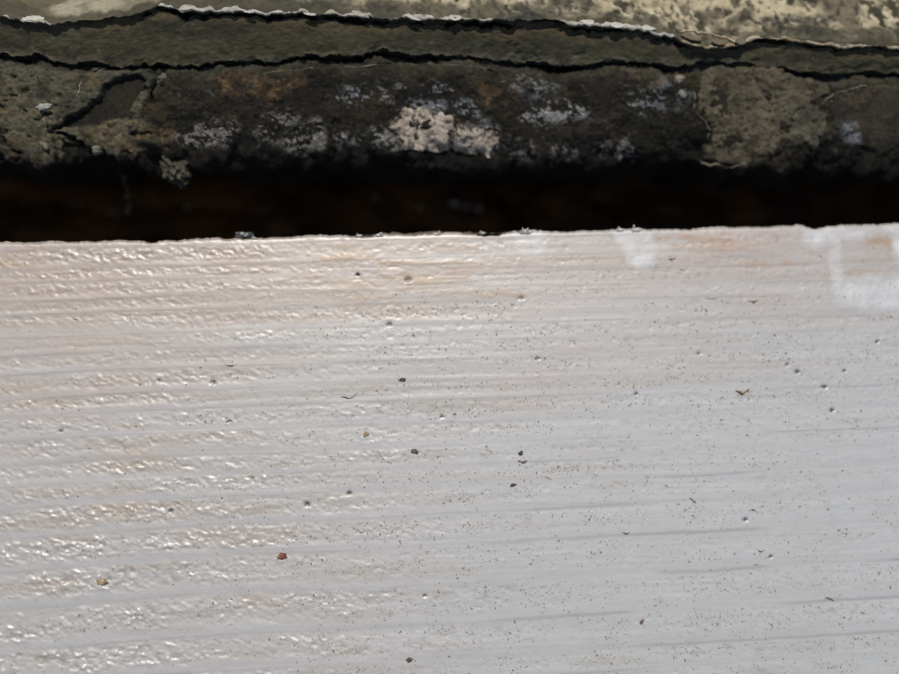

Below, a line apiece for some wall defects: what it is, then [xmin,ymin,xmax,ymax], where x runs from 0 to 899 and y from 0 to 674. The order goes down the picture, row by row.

peeling [3,0,513,26]
crack [142,8,517,30]
peeling [556,18,899,50]
crack [0,25,690,100]
efflorescence [169,68,652,168]
efflorescence [612,72,701,124]